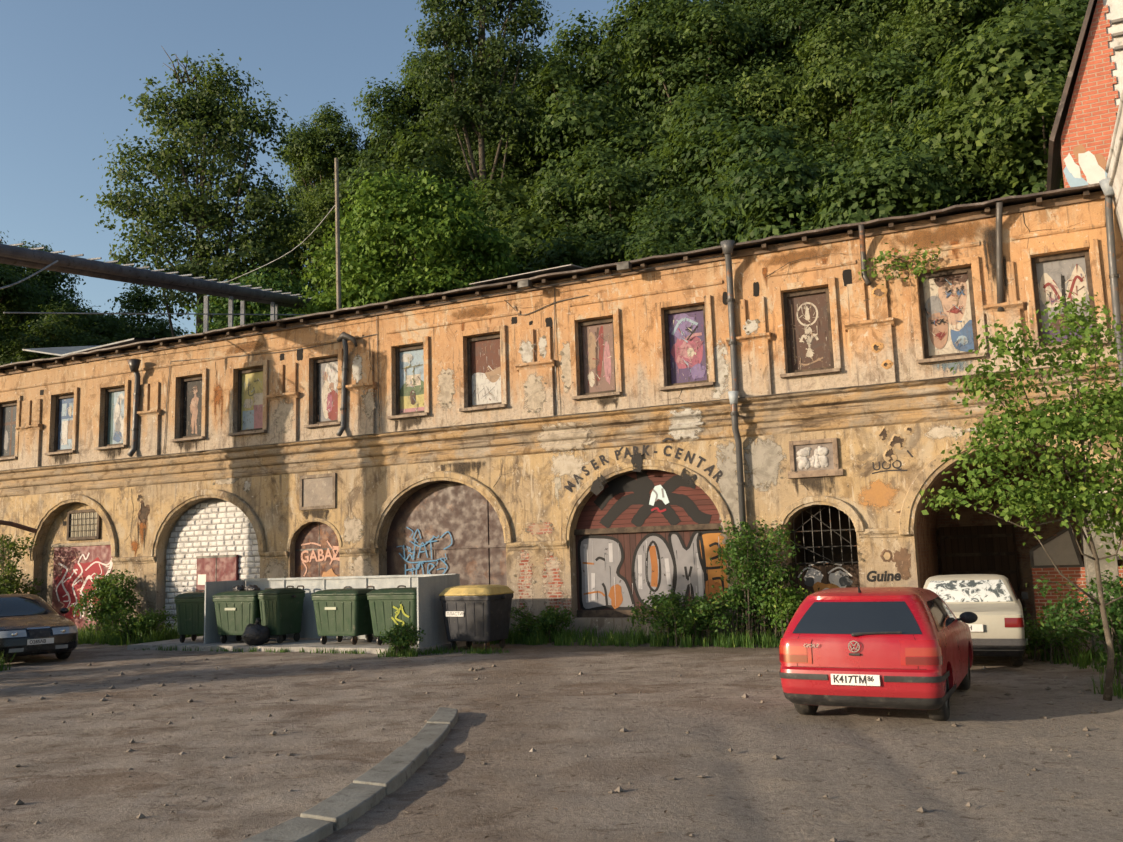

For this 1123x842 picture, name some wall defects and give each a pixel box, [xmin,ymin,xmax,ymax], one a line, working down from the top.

flaking render [871,342,894,370]
corrosion [214,385,223,425]
flaking render [437,368,455,411]
flaking render [511,317,595,454]
flaking render [667,406,704,441]
spalling [514,550,571,618]